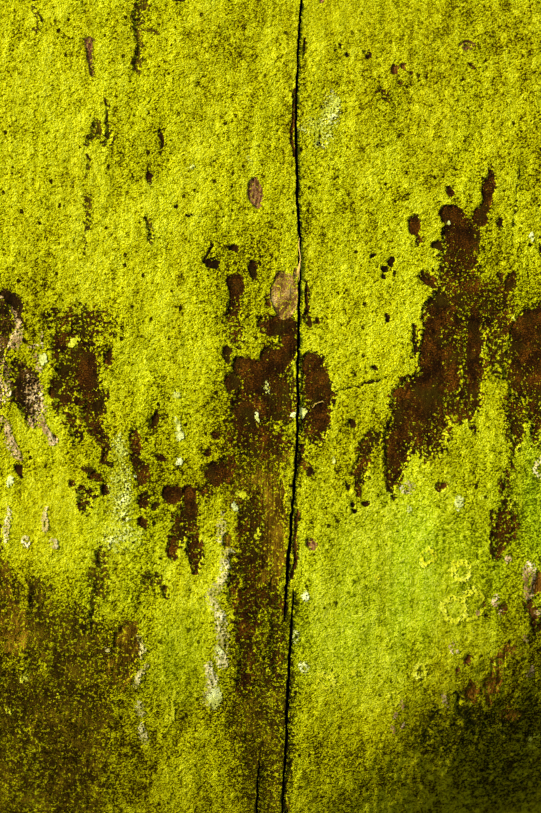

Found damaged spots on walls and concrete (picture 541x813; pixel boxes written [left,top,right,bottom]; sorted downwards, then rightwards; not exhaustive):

crack [281,0,303,813]
water stain [487,468,522,562]
crack [253,761,261,813]